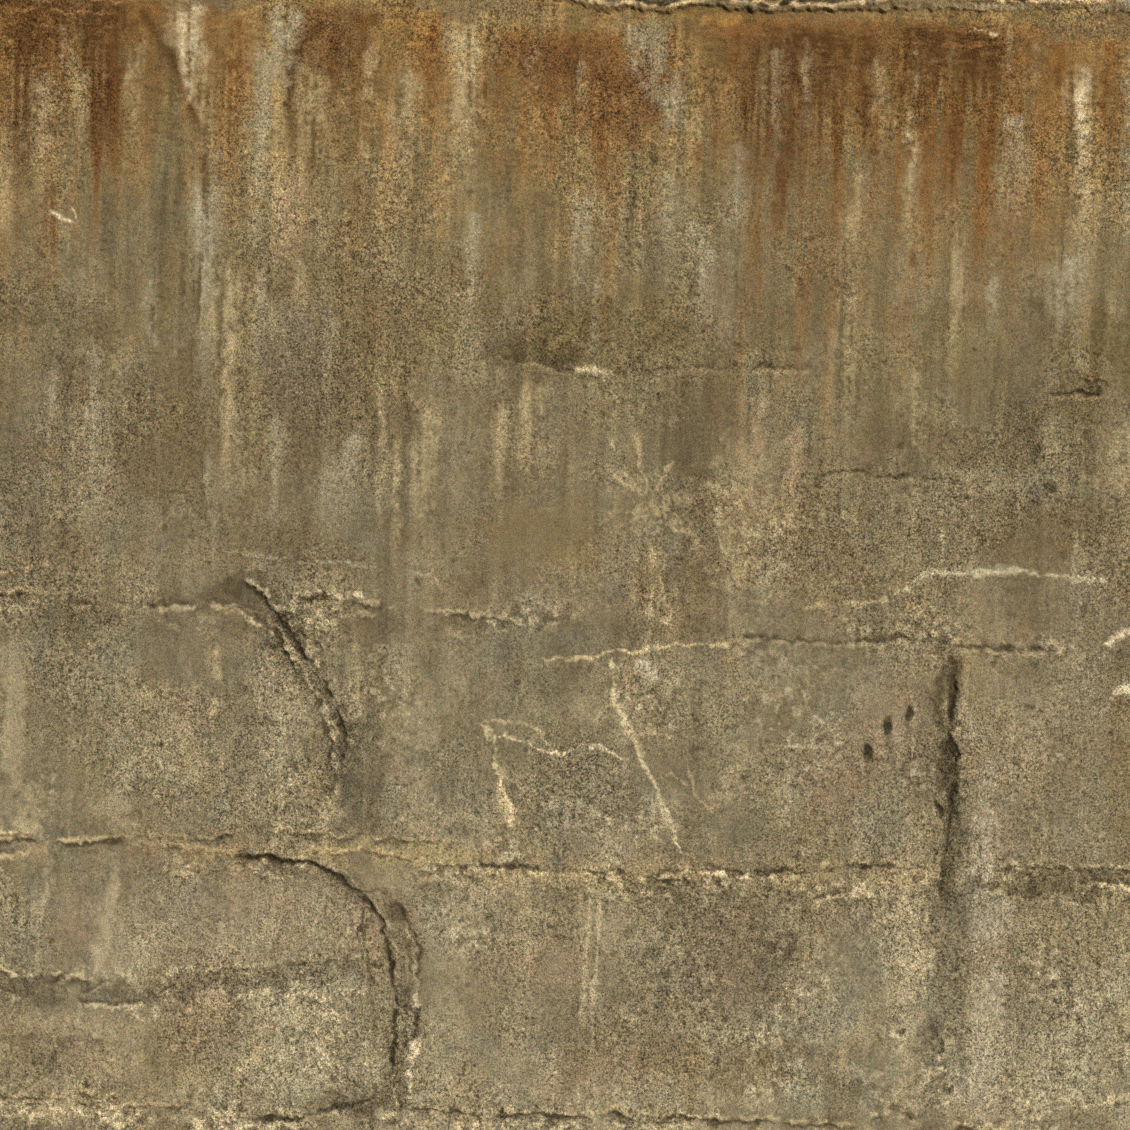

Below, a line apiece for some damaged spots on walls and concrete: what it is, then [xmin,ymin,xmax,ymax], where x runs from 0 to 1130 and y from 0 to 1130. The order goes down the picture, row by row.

corrosion [0,0,266,296]
water stain [0,1,350,805]
corrosion [280,0,455,300]
water stain [303,11,825,643]
corrosion [469,10,1130,497]
water stain [823,152,878,424]
water stain [863,55,891,133]
crack [794,456,971,491]
water stain [896,109,926,222]
water stain [896,364,931,543]
water stain [331,681,394,836]
crack [0,518,1130,1130]